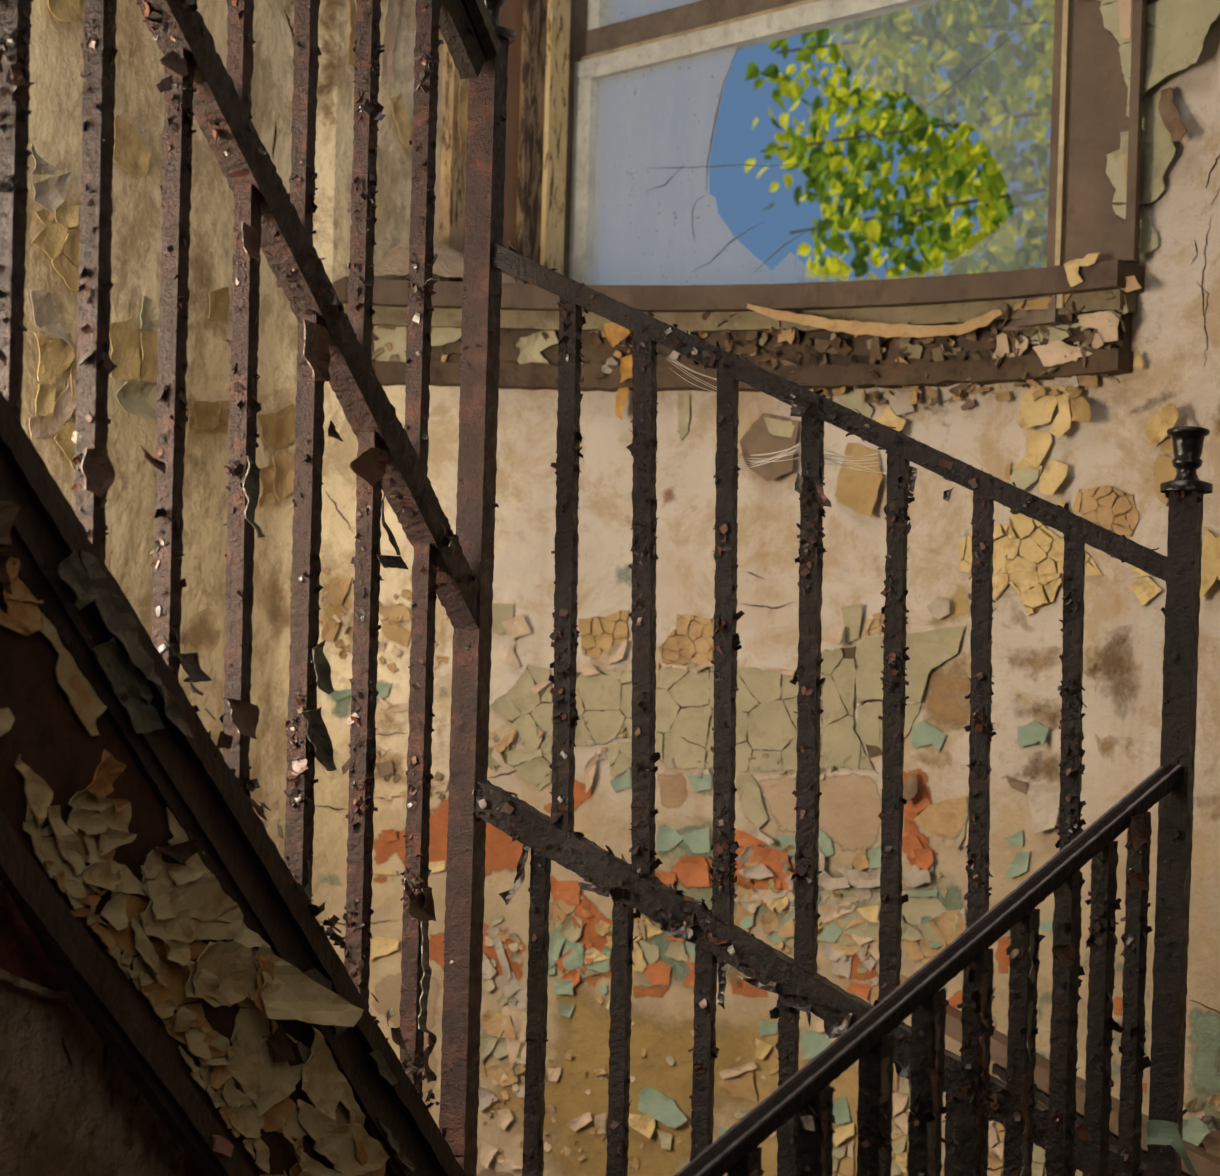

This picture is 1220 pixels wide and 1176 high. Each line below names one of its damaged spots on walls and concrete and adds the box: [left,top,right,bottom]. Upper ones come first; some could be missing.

peeling [1097,0,1220,254]
peeling [747,253,1100,338]
crack [1190,155,1220,368]
peeling [1005,276,1142,537]
peeling [992,513,1064,616]
peeling [575,610,632,794]
peeling [655,614,714,792]
peeling [820,603,885,780]
peeling [14,749,415,1176]
peeling [478,915,529,1130]
peeling [734,666,799,954]
peeling [817,829,881,1004]